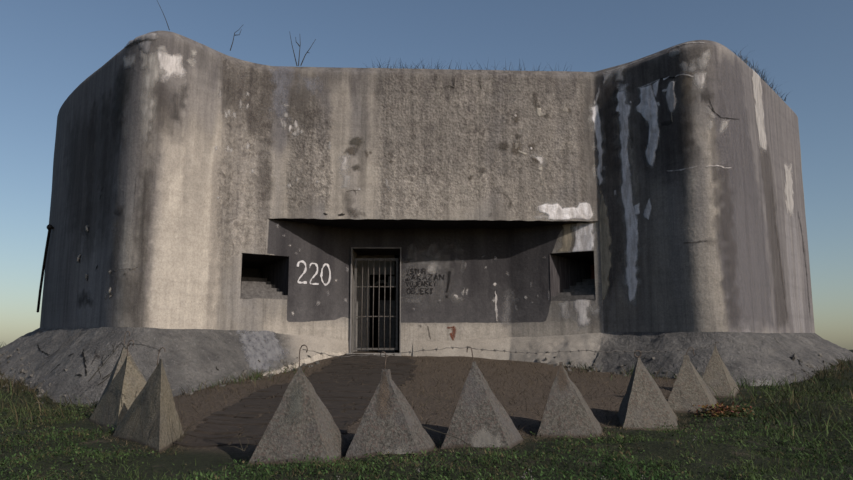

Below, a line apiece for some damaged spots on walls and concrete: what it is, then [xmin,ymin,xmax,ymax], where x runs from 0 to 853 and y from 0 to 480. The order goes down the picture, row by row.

damp [123,46,196,135]